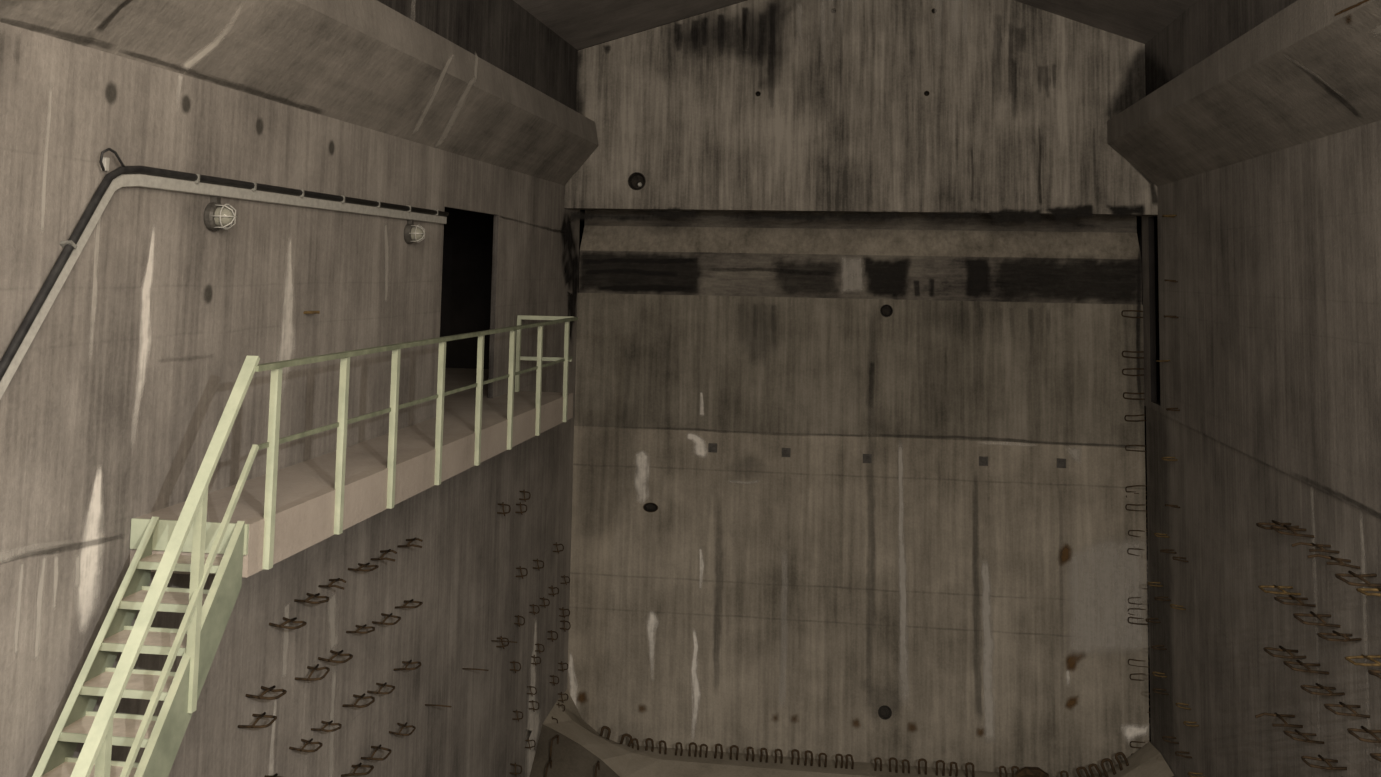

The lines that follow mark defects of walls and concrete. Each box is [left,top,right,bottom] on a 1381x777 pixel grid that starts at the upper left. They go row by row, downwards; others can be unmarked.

leakage [676,3,783,66]
leakage [41,88,52,230]
leakage [635,452,649,500]
rust [1060,545,1071,564]
leakage [692,631,700,729]
rust [1067,653,1085,680]